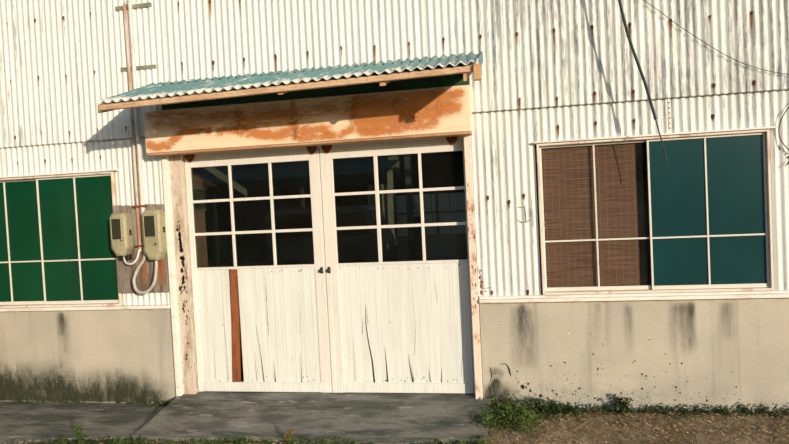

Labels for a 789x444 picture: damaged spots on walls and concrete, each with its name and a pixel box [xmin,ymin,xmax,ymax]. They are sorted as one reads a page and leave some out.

peeling [176,220,190,325]